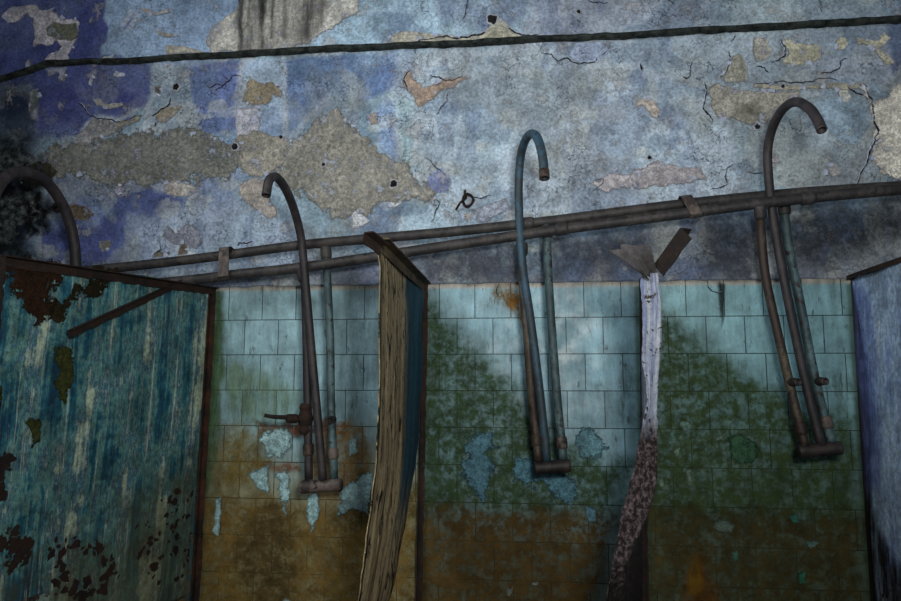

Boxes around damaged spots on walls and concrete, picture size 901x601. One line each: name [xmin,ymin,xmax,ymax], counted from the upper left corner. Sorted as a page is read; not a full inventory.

peeling [2,4,80,60]
peeling [153,0,359,55]
crack [418,0,485,41]
crack [508,27,611,64]
peeling [709,32,901,181]
crack [756,40,880,184]
peeling [21,76,438,229]
damp [0,137,52,260]
rust [0,451,17,502]
rust [135,418,370,601]
rust [0,524,35,576]
rust [47,536,120,601]